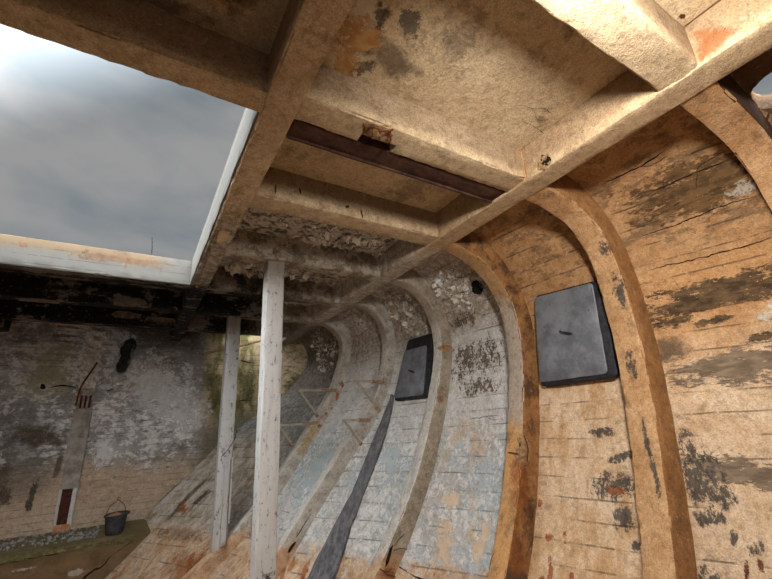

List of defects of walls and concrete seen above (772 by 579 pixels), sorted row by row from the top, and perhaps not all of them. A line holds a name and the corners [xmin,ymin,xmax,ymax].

leakage [334,0,422,78]
peeling [276,218,390,259]
leakage [97,348,214,434]
leakage [15,426,67,477]
mould [588,427,616,438]
leakage [25,477,39,511]
leakage [167,481,209,519]
mould [588,451,638,532]
mould [677,428,739,547]
crack [0,541,131,579]
crack [380,535,423,579]
rust [744,559,764,579]